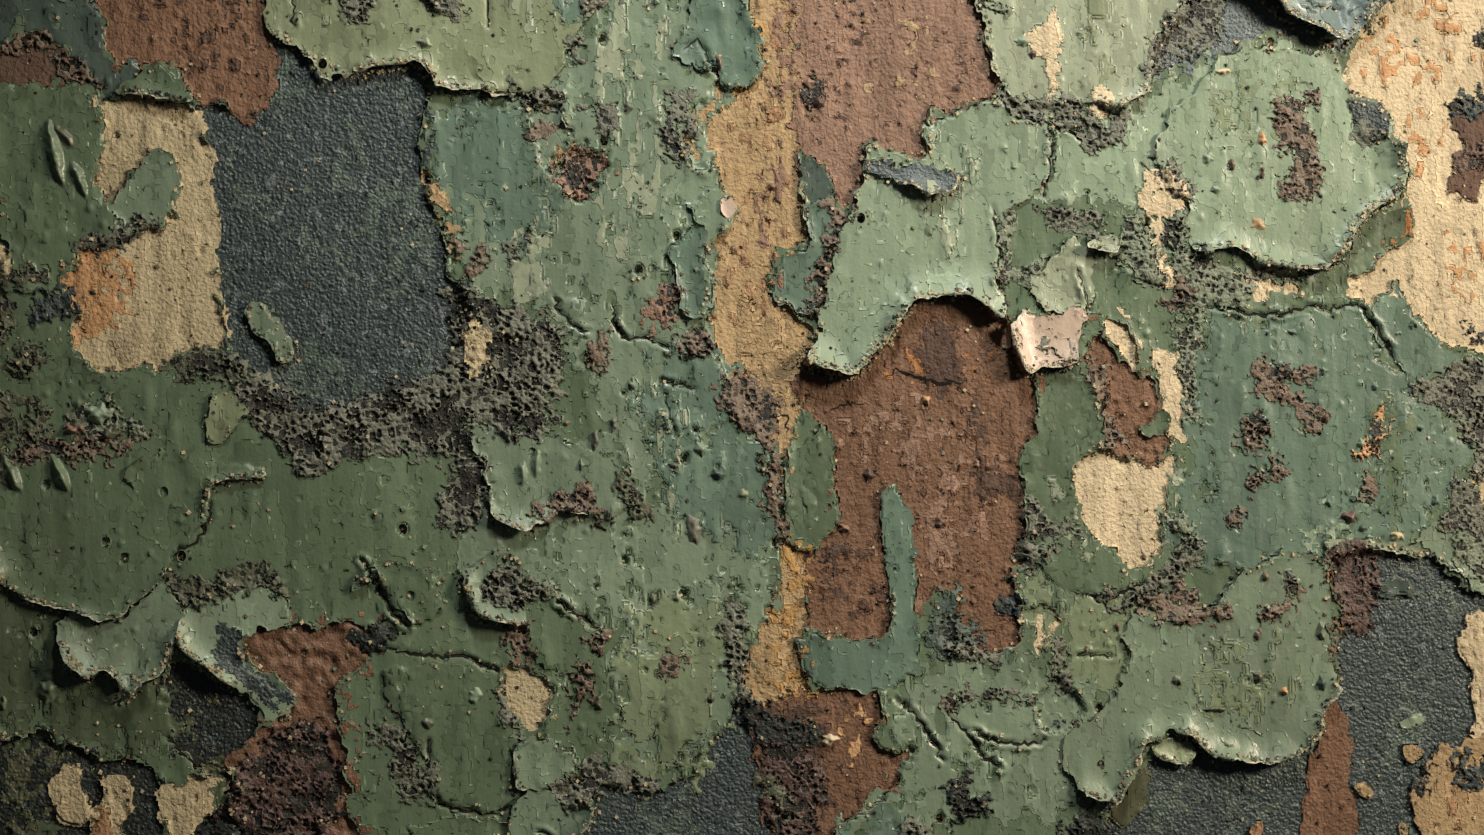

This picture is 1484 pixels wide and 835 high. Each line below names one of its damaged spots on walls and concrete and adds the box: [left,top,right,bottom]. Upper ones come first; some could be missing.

spalling [0,0,634,835]
spalling [383,0,1484,835]